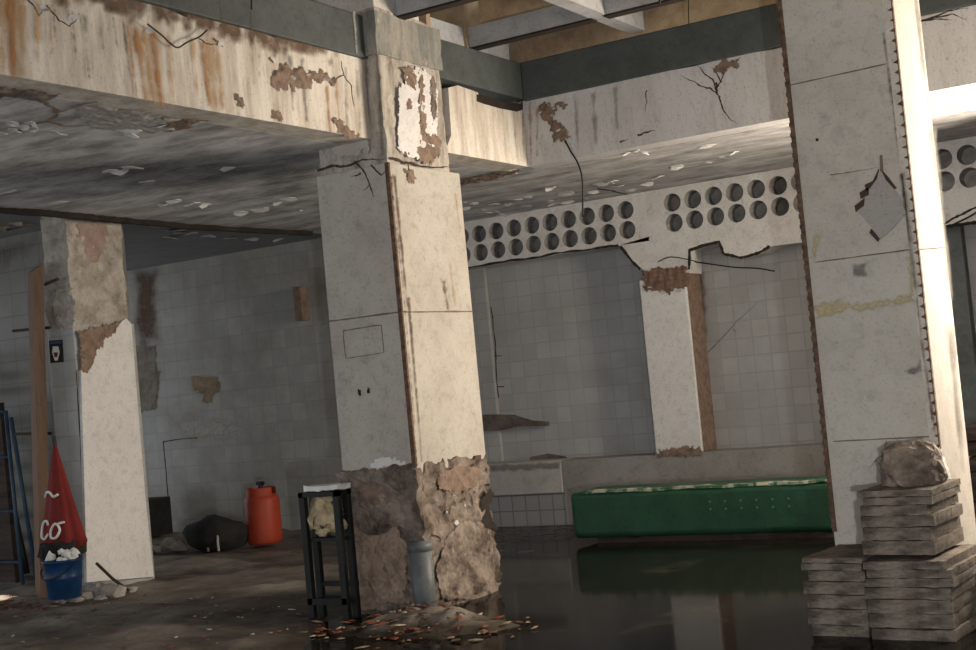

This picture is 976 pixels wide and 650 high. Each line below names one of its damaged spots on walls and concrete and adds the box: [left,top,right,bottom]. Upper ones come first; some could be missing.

rust [0,0,51,75]
crack [17,101,98,131]
rust [127,26,173,103]
spalling [91,0,337,92]
spalling [397,65,442,184]
crack [682,66,737,124]
crack [317,157,459,197]
spalling [641,265,689,295]
crack [688,240,770,269]
spalling [44,284,120,373]
spalling [136,344,161,413]
spalling [335,453,503,614]